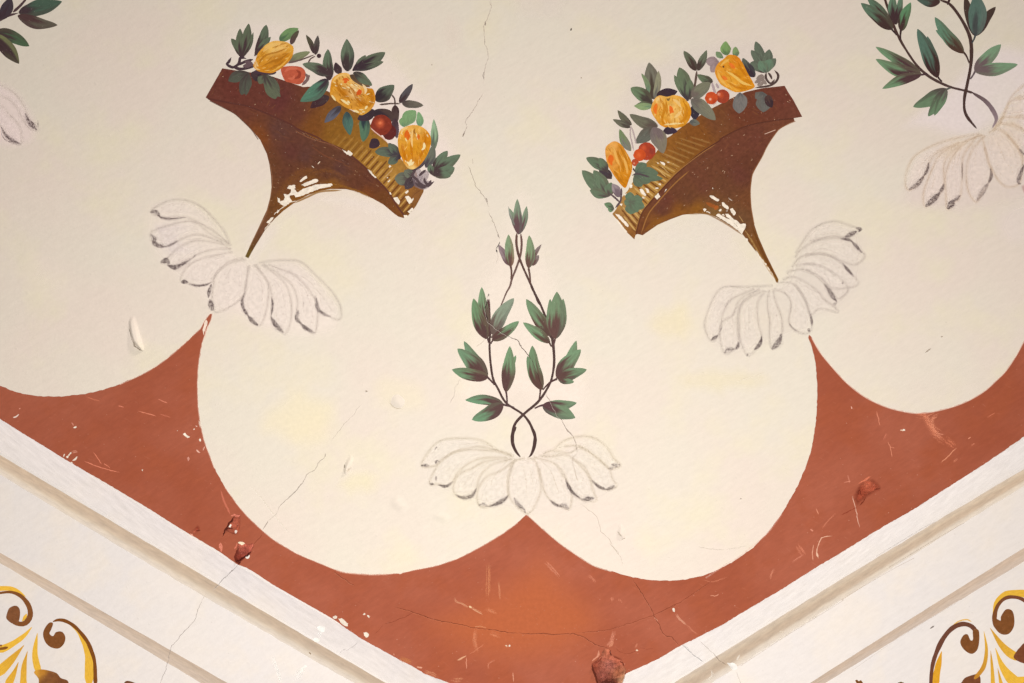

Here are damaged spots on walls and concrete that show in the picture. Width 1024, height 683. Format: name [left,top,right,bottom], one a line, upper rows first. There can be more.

peeling [264,163,332,230]
crack [468,159,500,253]
peeling [703,187,748,241]
crack [255,407,359,543]
flaking render [219,514,254,565]
crack [160,565,238,683]
crack [339,582,741,683]